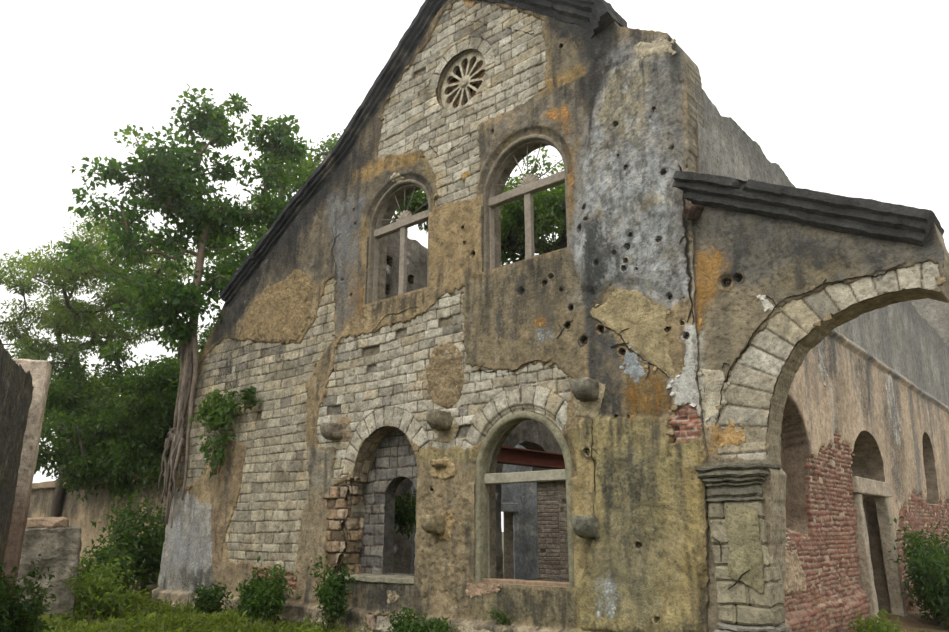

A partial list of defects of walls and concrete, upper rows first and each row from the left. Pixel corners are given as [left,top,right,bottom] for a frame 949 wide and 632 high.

spalling [378,0,547,208]
damp [583,216,611,309]
crack [678,164,694,325]
crack [482,360,550,379]
crack [556,316,668,379]
crack [715,262,906,425]
spalling [177,278,572,590]
damp [602,448,654,534]
spalling [784,429,870,632]
spalling [366,590,422,632]
peeling [465,582,500,598]
damp [595,582,640,632]